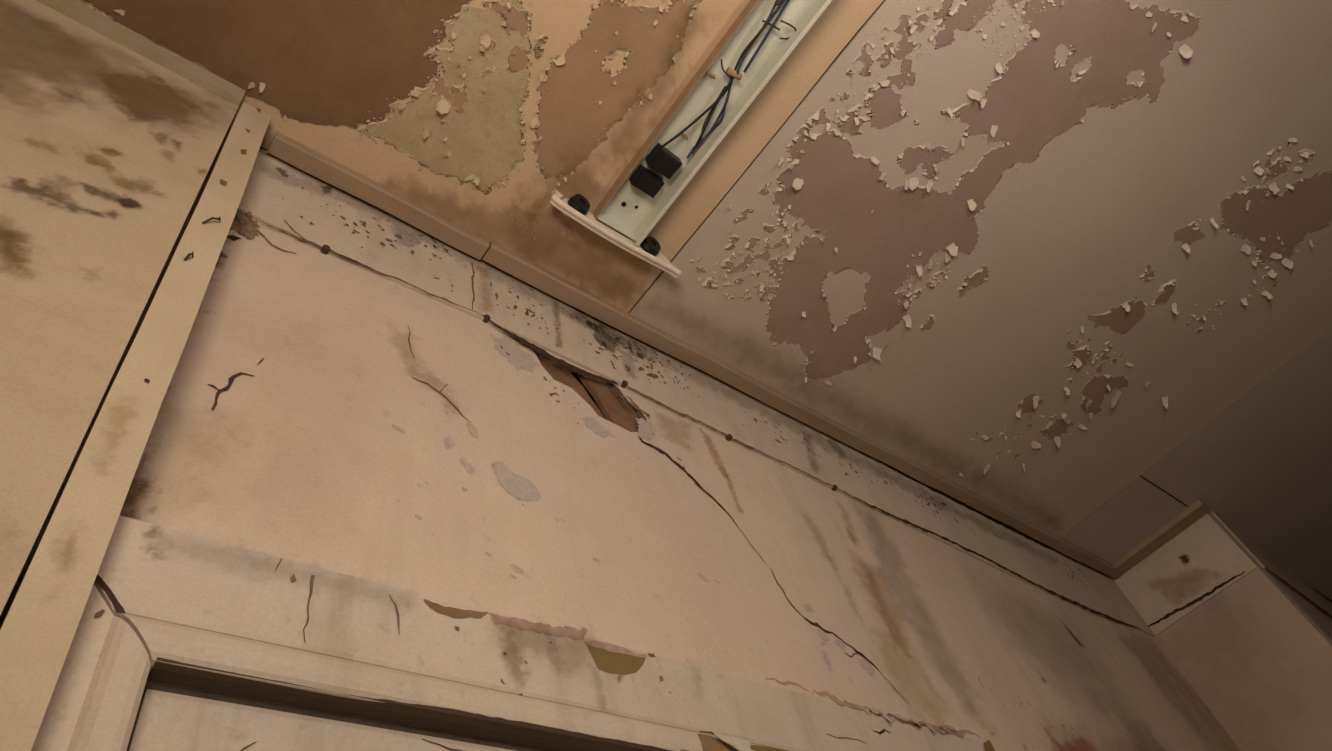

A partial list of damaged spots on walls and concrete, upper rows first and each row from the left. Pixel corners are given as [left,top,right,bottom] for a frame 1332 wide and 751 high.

leakage [0,4,197,120]
peeling [79,0,702,201]
leakage [72,185,141,215]
crack [208,358,264,411]
crack [249,215,482,315]
leakage [302,186,454,292]
flaking render [482,315,657,441]
leakage [473,279,701,397]
peeling [690,0,1202,386]
peeling [970,138,1332,475]
crack [639,436,909,704]
crack [627,386,1332,629]